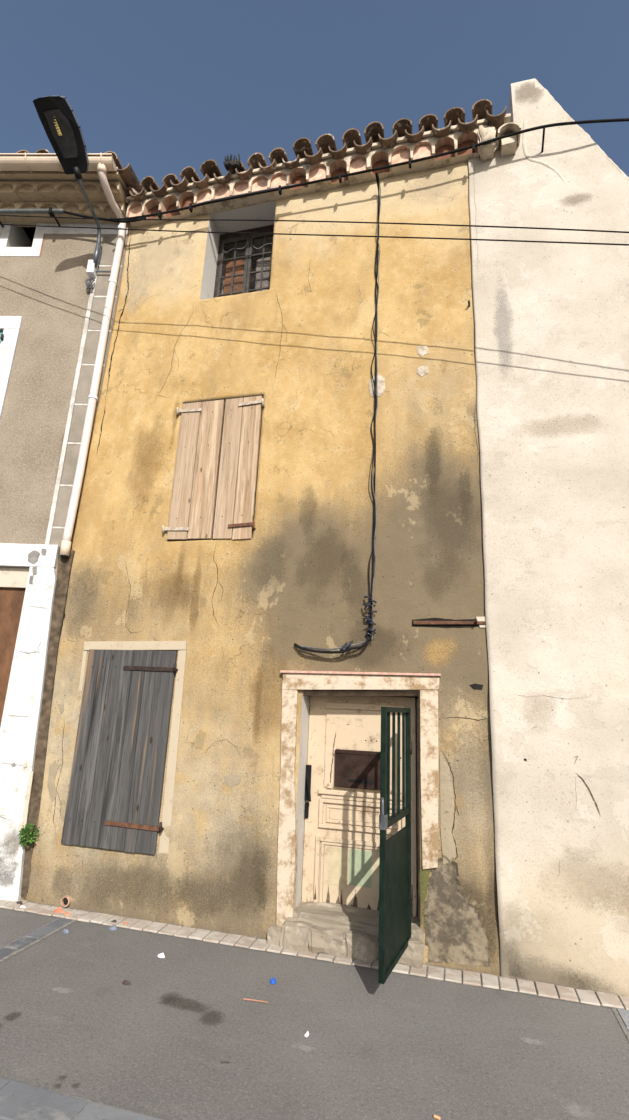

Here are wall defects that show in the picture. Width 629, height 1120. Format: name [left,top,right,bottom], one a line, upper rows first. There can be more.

crack [97,230,132,452]
crack [212,546,223,624]
spalling [411,755,491,967]